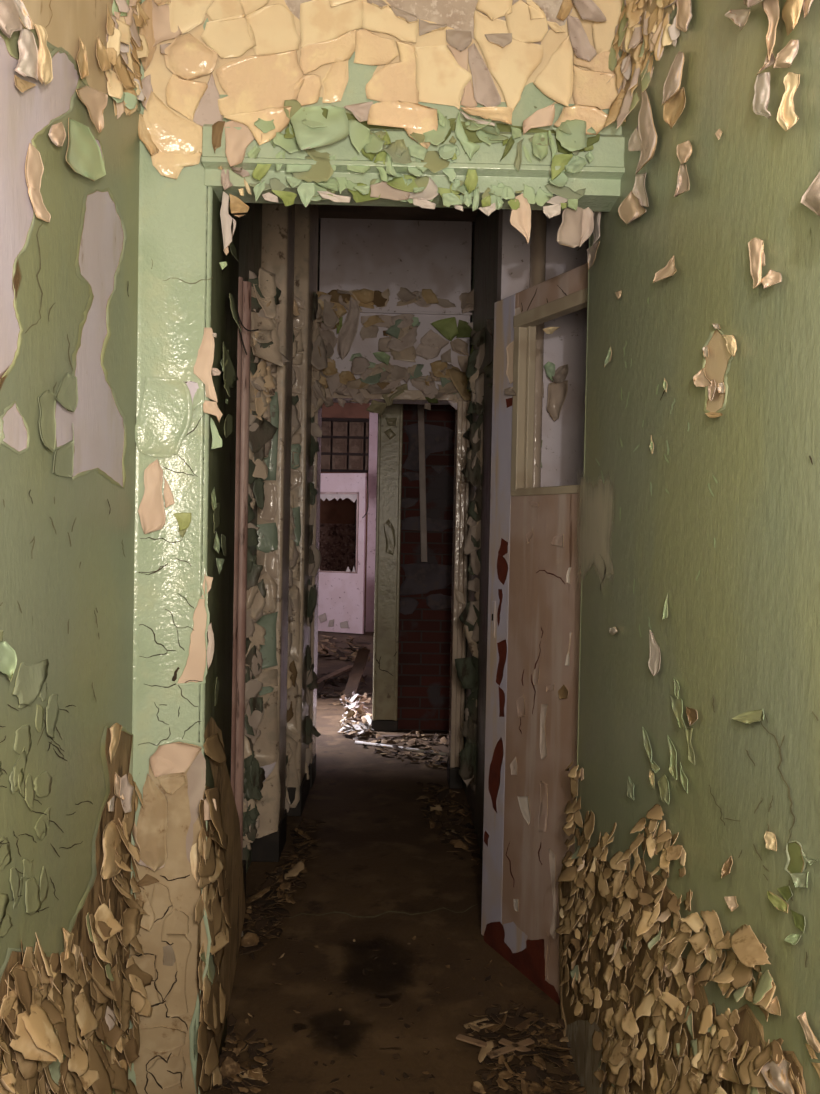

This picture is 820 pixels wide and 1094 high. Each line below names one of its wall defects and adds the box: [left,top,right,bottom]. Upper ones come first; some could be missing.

peeling [725,0,814,131]
peeling [0,0,692,488]
peeling [748,238,782,289]
peeling [693,323,737,418]
crack [161,417,202,477]
crack [3,490,81,568]
crack [122,537,191,575]
crack [139,594,202,746]
peeling [0,268,518,1094]
peeling [484,666,820,1094]
crack [136,875,190,1030]
crack [144,1054,183,1094]